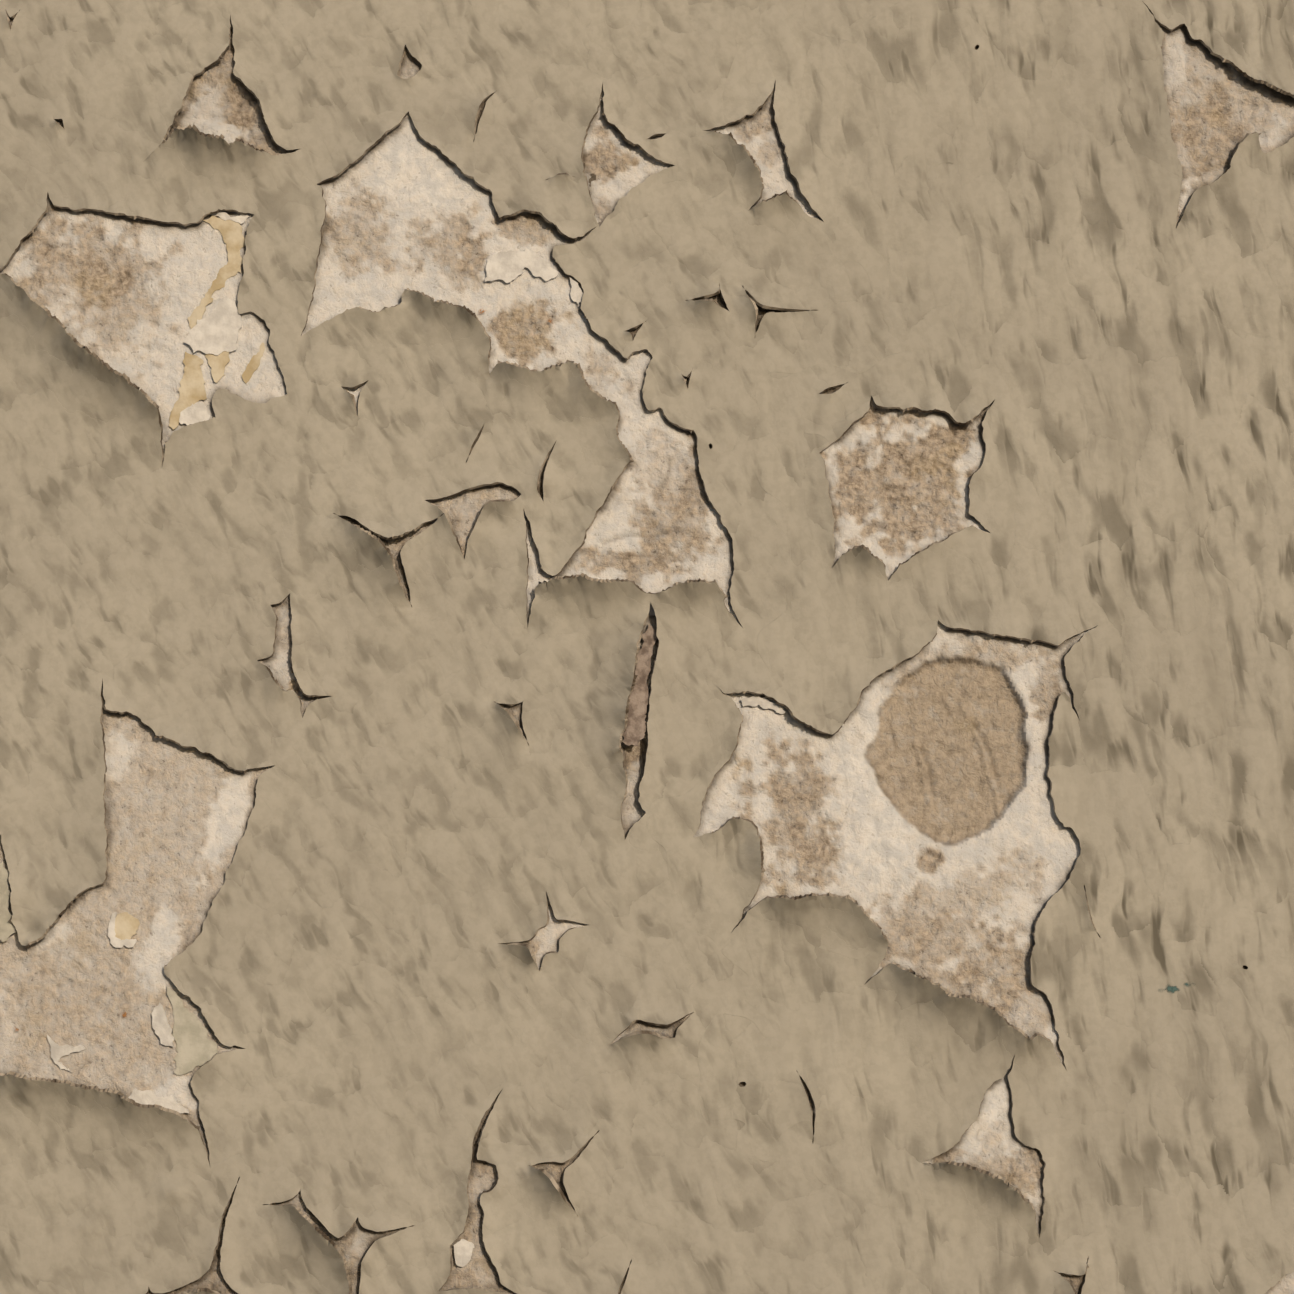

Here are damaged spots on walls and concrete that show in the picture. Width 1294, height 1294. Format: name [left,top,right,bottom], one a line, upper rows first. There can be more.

peeling [134,19,302,177]
peeling [689,81,822,234]
peeling [1147,12,1294,228]
peeling [0,191,287,490]
peeling [295,86,751,649]
peeling [810,393,997,594]
peeling [241,595,331,717]
peeling [0,676,274,1193]
peeling [486,892,587,988]
peeling [679,608,1097,1258]
peeling [436,1092,517,1294]
peeling [1157,1145,1294,1294]